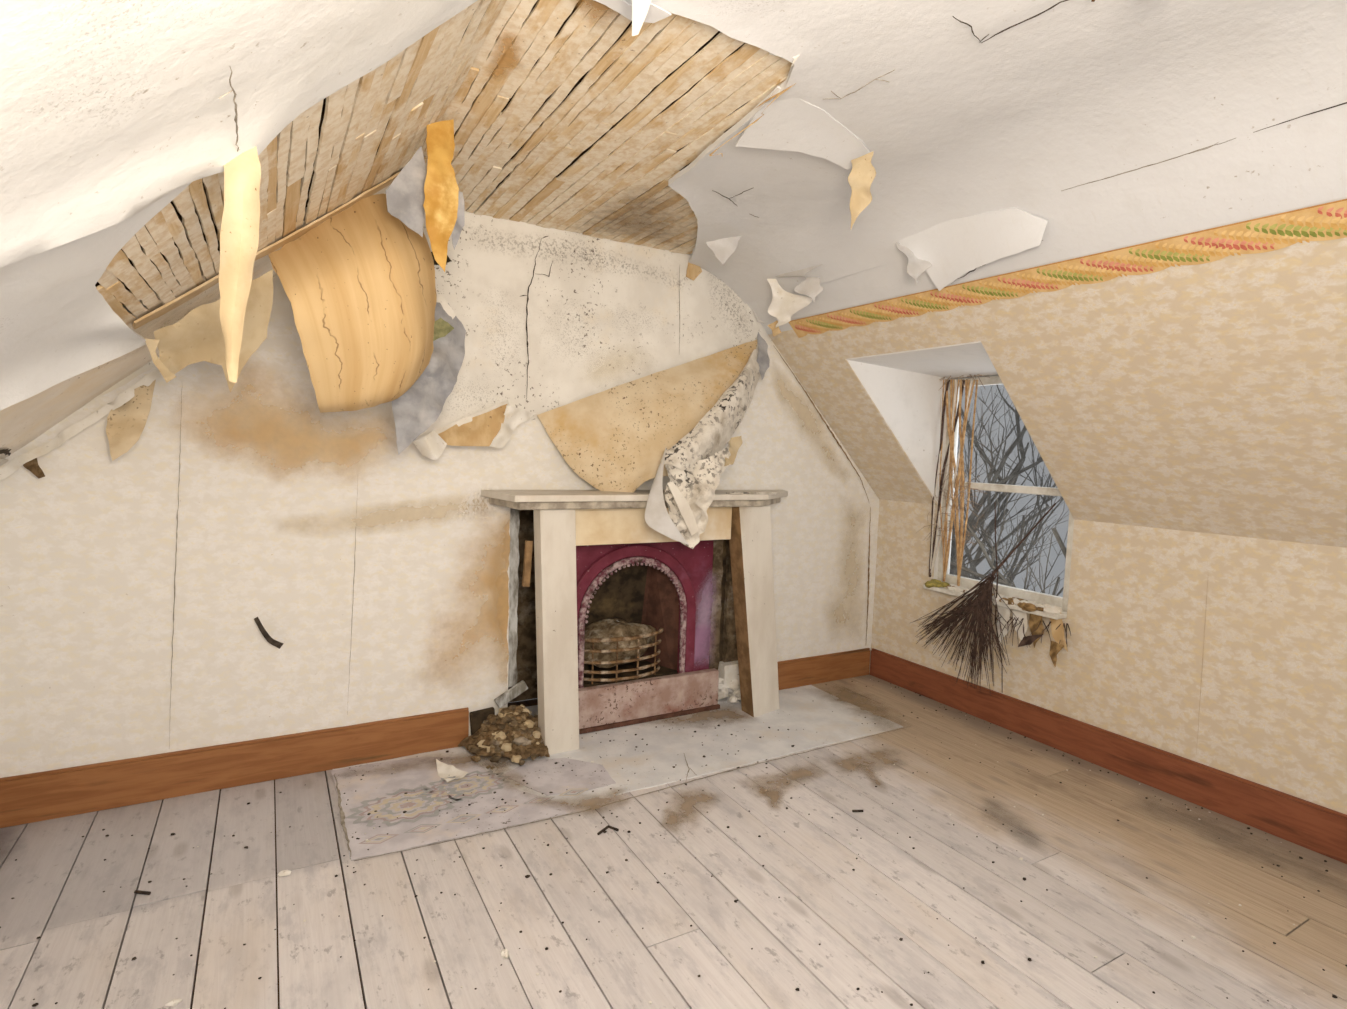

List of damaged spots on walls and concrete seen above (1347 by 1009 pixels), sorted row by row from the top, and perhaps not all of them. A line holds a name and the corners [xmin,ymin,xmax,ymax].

peeling [594,0,671,36]
crack [953,0,1068,43]
crack [219,67,239,151]
peeling [709,55,800,157]
crack [1062,102,1347,191]
flaking render [686,261,702,281]
peeling [706,236,741,265]
crack [519,236,553,399]
damp [210,387,380,466]
damp [463,522,511,651]